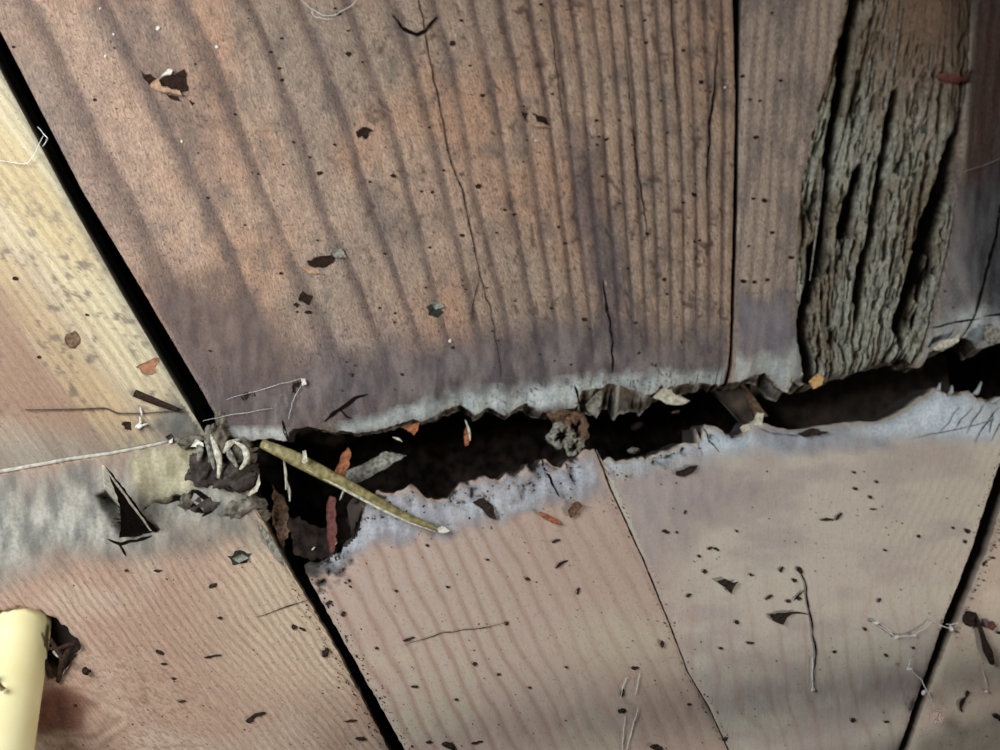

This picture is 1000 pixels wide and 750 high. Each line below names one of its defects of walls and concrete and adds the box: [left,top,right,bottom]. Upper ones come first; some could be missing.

crack [418,0,501,377]
peeling [932,331,961,351]
peeling [984,324,1000,346]
peeling [292,378,307,394]
peeling [585,389,603,419]
peeling [653,386,690,405]
peeling [740,412,765,435]
leakage [0,464,251,572]
peeling [256,484,346,566]